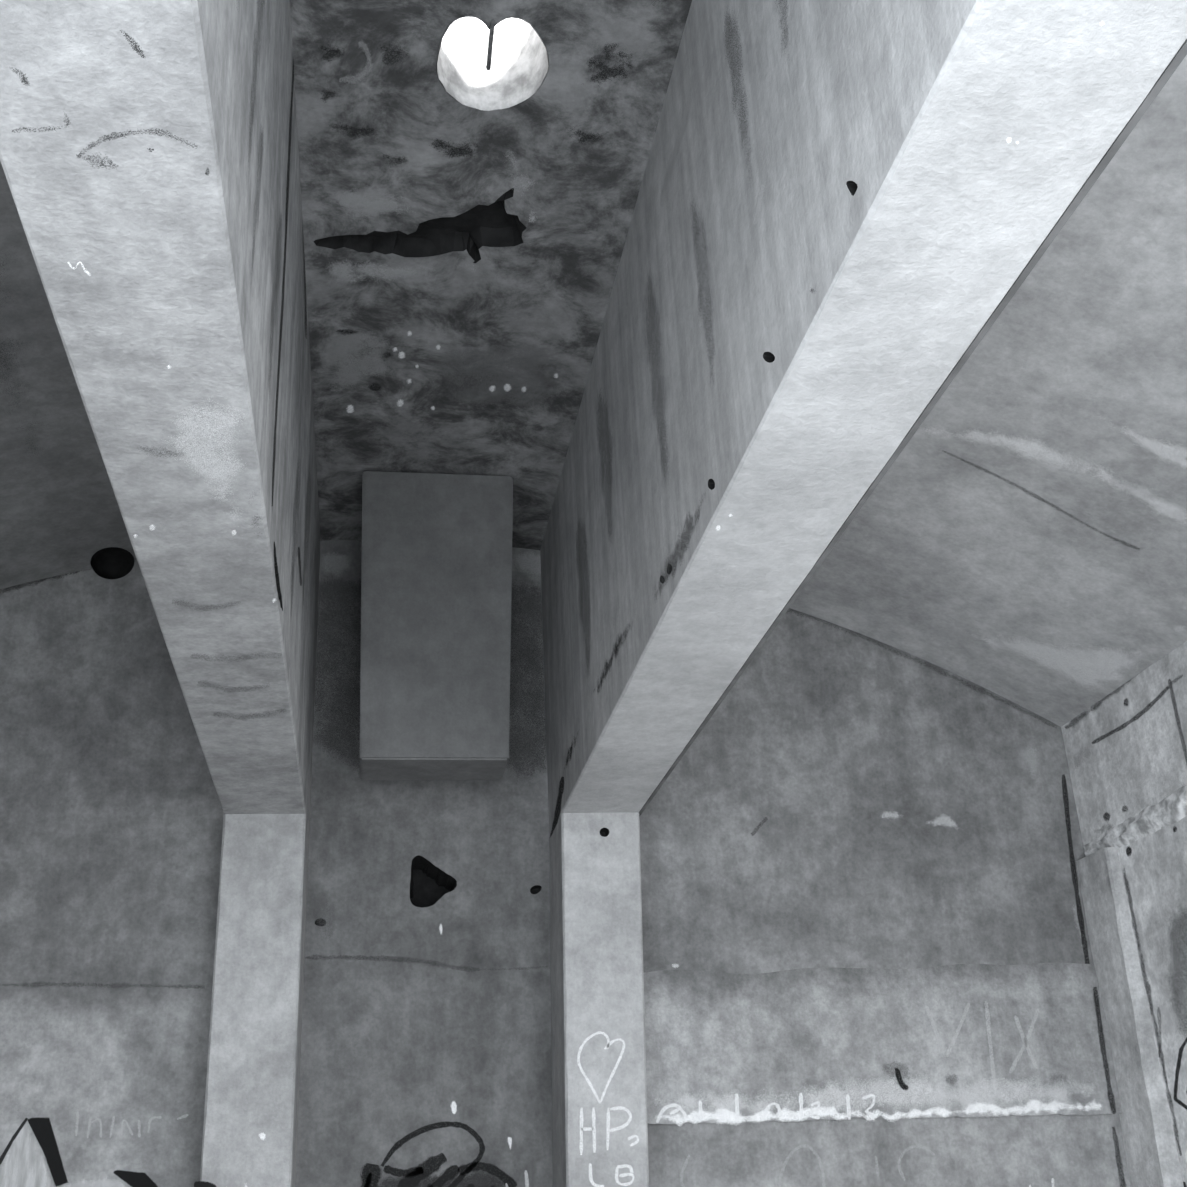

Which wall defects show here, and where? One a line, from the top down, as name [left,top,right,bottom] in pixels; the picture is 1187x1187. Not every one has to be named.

crack [942,450,1140,551]
spalling [1094,805,1128,834]
damp [1164,900,1187,1036]